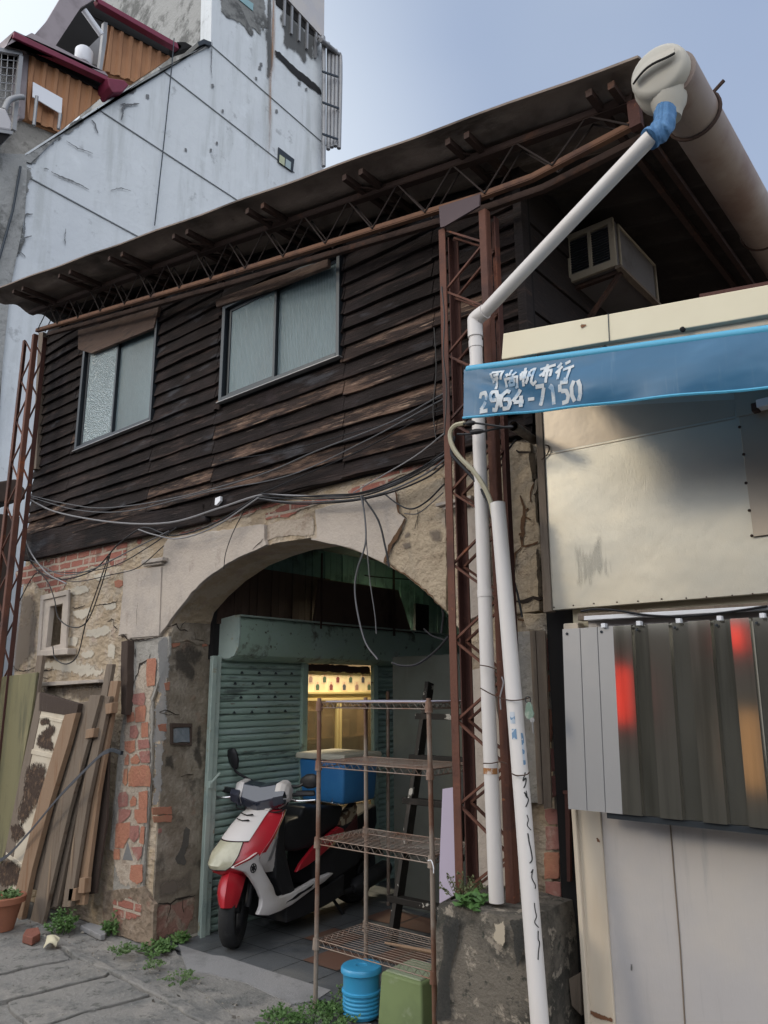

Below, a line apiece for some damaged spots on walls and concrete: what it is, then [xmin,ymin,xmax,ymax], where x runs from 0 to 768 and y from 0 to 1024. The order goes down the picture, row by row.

peeling [221,0,320,63]
flaking render [15,538,142,595]
crack [383,492,444,610]
crack [514,483,538,563]
flaking render [44,607,115,677]
damp [176,644,201,681]
crack [516,596,543,621]
flaking render [113,637,180,920]